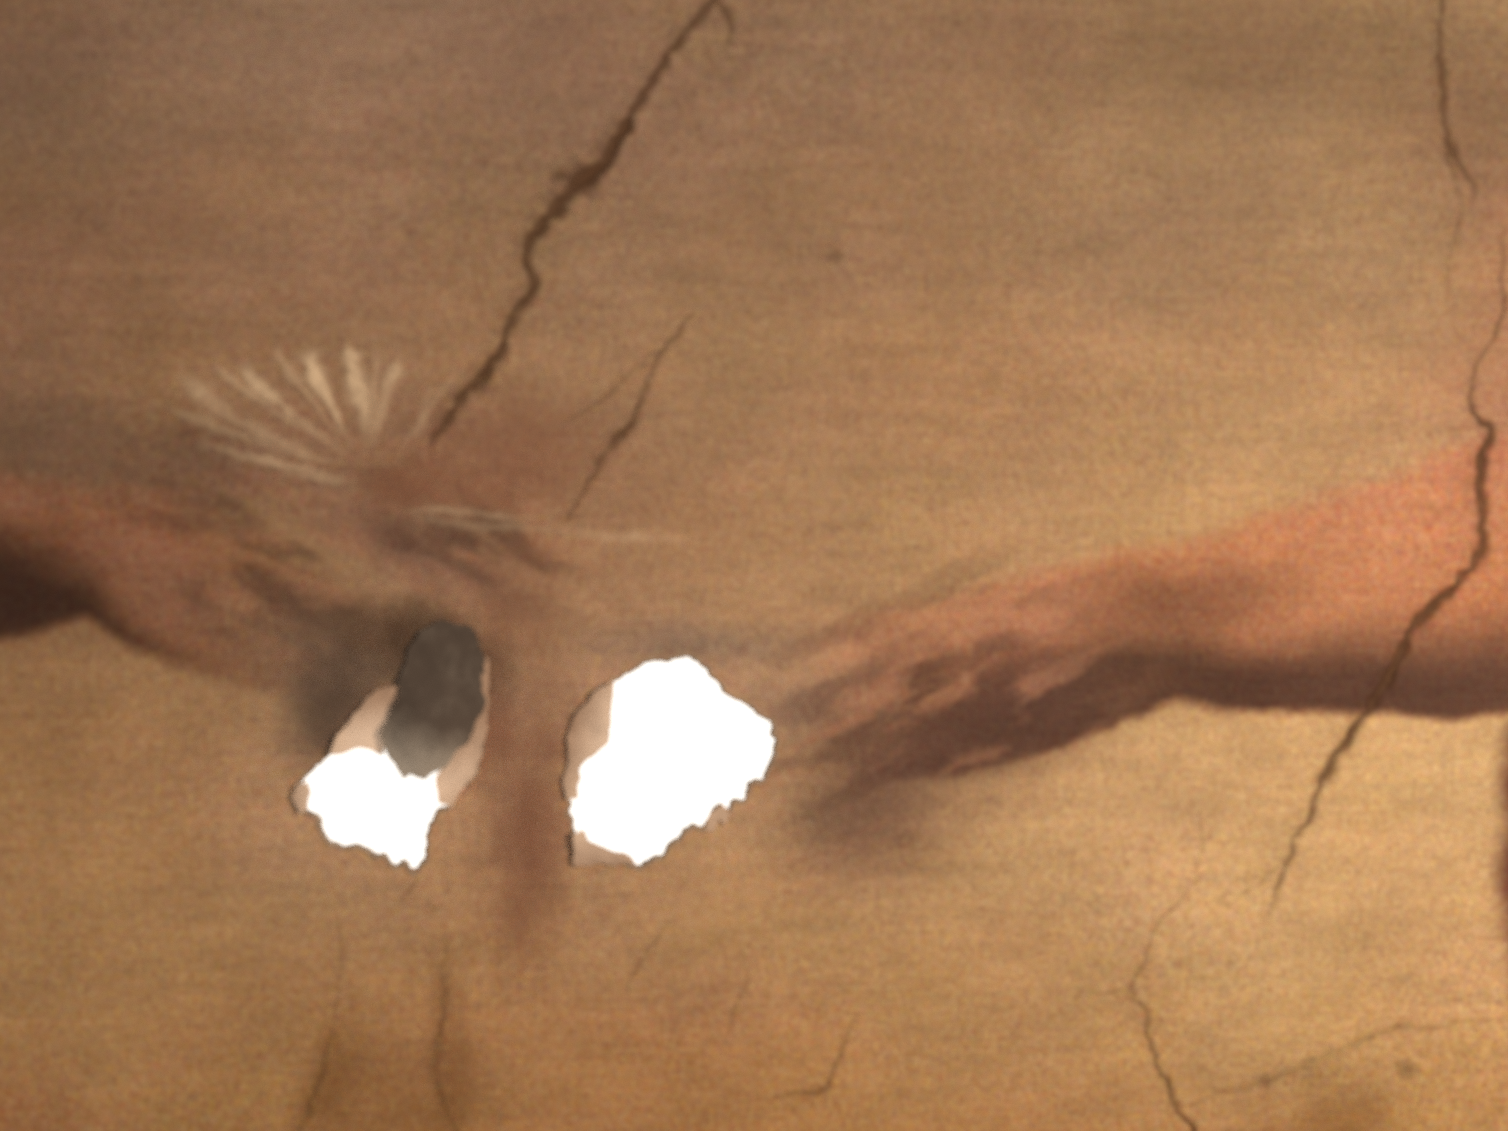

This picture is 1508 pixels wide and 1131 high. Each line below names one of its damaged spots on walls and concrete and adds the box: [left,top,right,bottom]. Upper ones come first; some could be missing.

crack [1437,46,1458,157]
crack [439,18,698,433]
crack [1310,404,1494,816]
peeling [329,685,400,756]
peeling [435,656,490,808]
peeling [563,681,615,800]
peeling [291,781,311,814]
peeling [573,829,637,867]
peeling [704,804,729,832]
crack [1168,1080,1196,1131]